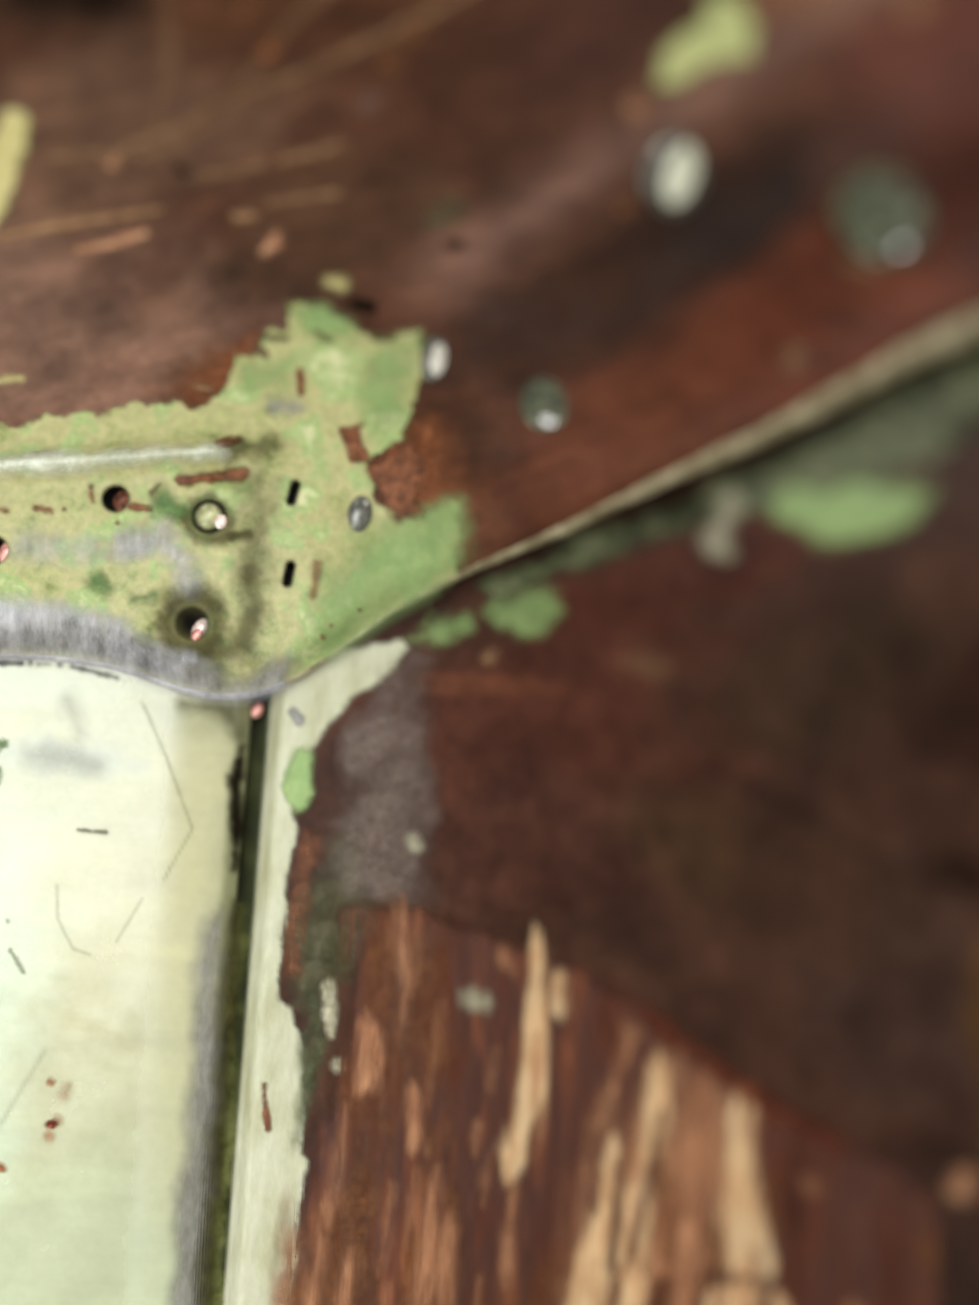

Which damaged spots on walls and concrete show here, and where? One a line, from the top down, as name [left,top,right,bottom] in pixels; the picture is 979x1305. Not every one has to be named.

peeling [0,109,29,215]
peeling [0,278,979,1305]